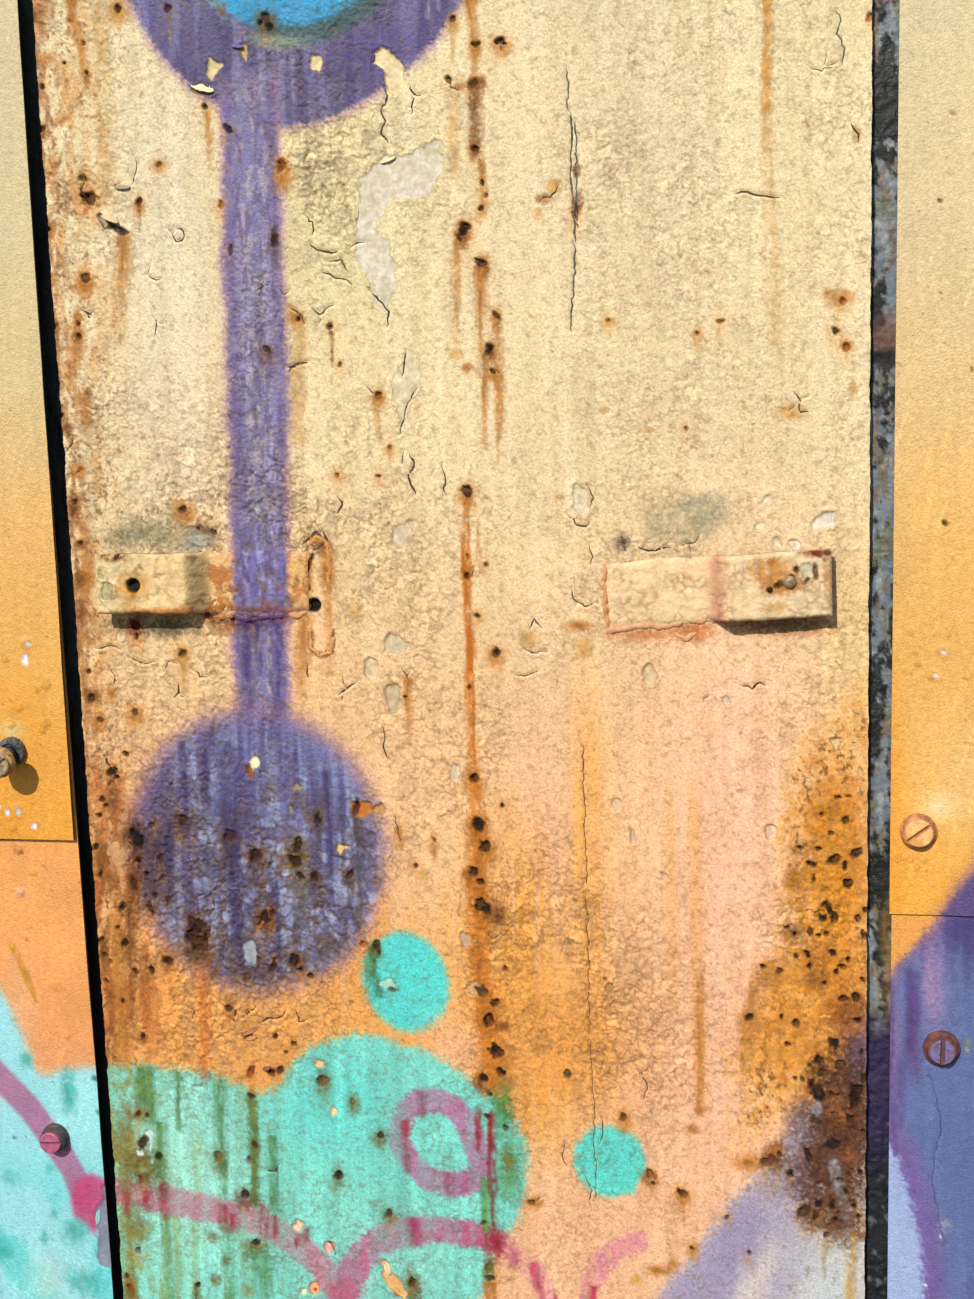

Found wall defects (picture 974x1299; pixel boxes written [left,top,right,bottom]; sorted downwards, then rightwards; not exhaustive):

corrosion [446,0,511,212]
peeling [353,139,444,311]
crack [566,69,578,331]
corrosion [452,224,502,444]
corrosion [75,531,335,677]
corrosion [746,549,832,635]
peeling [243,940,257,964]
peeling [245,756,260,778]
spalling [337,843,355,889]
peeling [352,800,386,818]
corrosion [459,486,542,1233]
corrosion [738,779,867,1299]